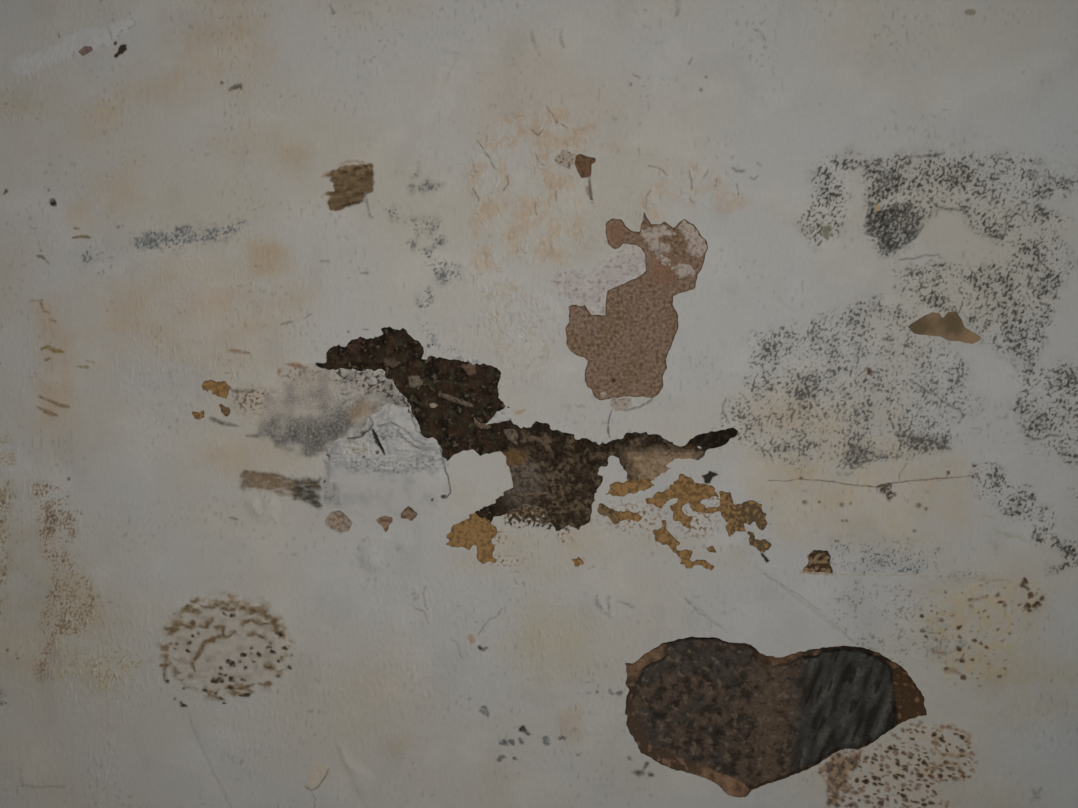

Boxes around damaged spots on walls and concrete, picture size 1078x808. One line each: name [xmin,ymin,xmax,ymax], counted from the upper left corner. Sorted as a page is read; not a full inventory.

leakage [0,0,414,507]
peeling [555,150,596,203]
peeling [552,212,708,434]
leakage [798,153,1078,463]
peeling [908,311,981,344]
leakage [0,465,131,717]
peeling [446,513,497,564]
leakage [438,516,769,693]
peeling [597,474,772,571]
leakage [702,301,1078,734]
spalling [625,637,927,798]
leakage [851,748,1043,808]